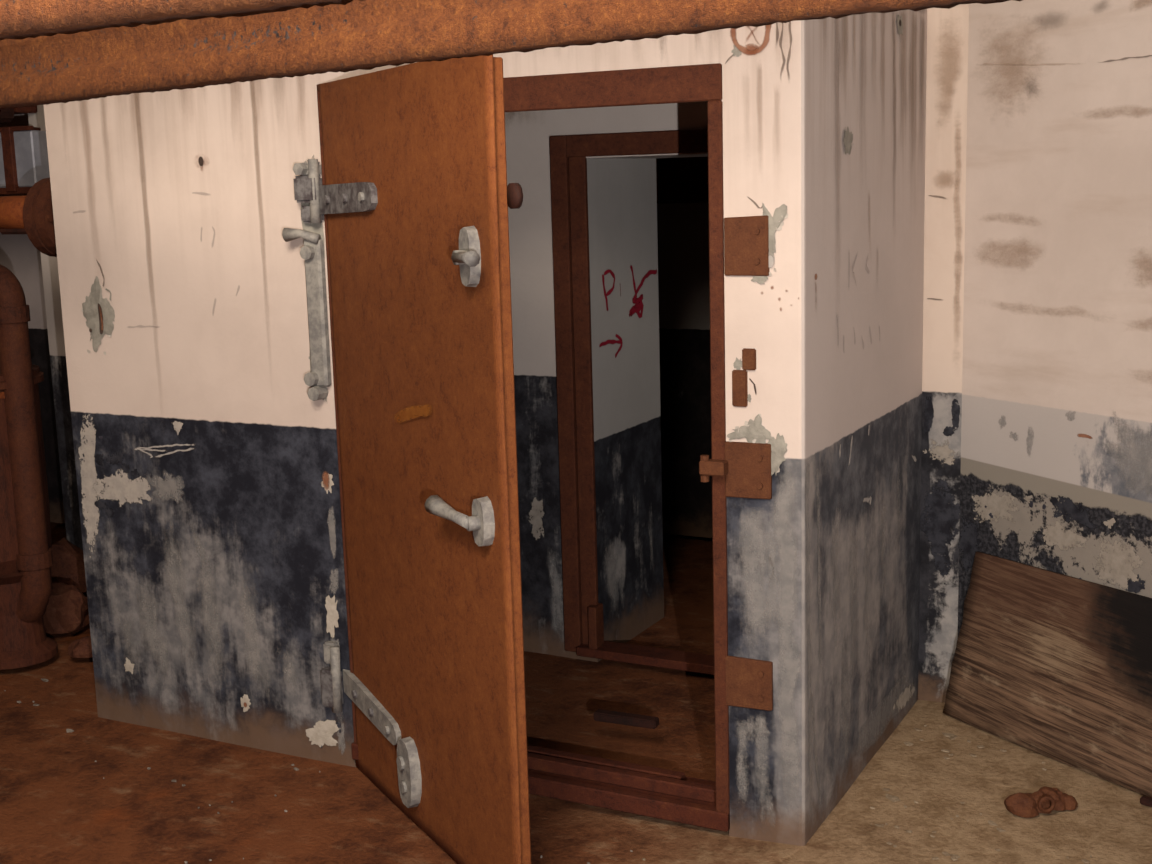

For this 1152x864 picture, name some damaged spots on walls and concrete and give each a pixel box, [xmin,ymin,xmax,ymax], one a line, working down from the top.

corrosion [726,25,771,63]
spalling [81,261,115,355]
spalling [733,357,756,402]
peeling [923,397,960,465]
peeling [78,414,183,558]
peeling [528,497,544,540]
peeling [920,479,1152,593]
peeling [549,559,563,630]
peeling [727,414,821,809]